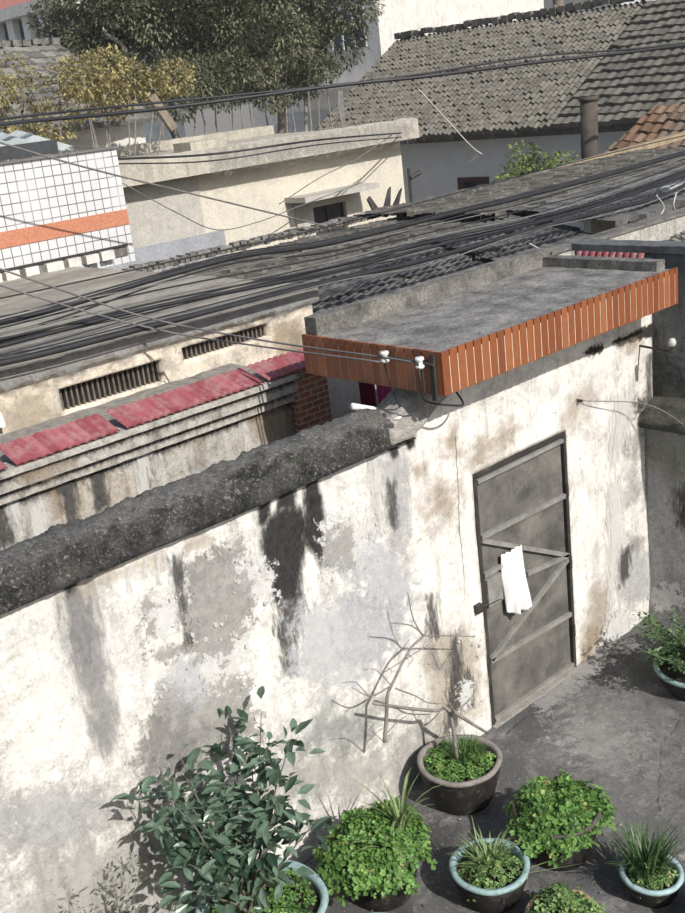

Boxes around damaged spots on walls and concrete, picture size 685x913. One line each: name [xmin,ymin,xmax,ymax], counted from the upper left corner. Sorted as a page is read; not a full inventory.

leakage [0,499,48,549]
leakage [57,482,79,522]
leakage [91,468,110,513]
leakage [134,452,155,494]
leakage [143,553,193,647]
leakage [259,436,420,705]
leakage [605,329,685,617]
leakage [57,583,119,752]
leakage [0,763,108,863]